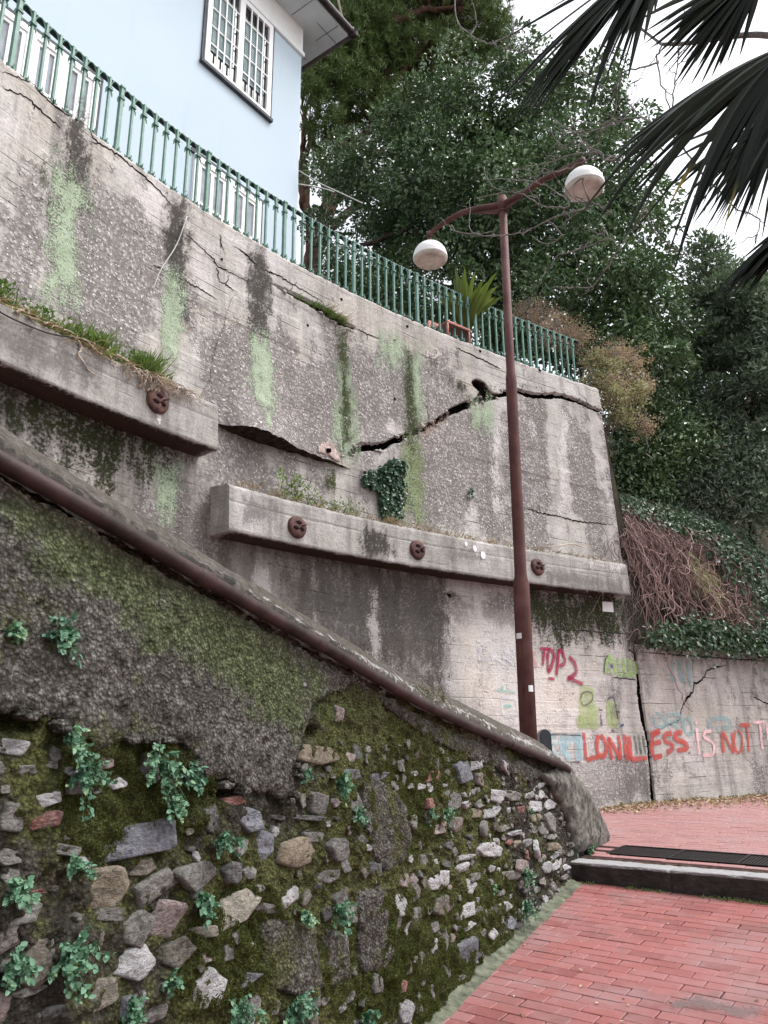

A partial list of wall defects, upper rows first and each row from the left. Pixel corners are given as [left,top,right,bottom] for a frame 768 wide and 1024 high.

water stain [35,96,101,244]
water stain [159,190,193,330]
water stain [244,244,275,343]
crack [155,234,387,342]
crack [341,347,603,458]
water stain [83,431,128,497]
water stain [552,615,572,656]
water stain [599,591,643,658]
crack [550,628,759,801]
flaking render [359,779,412,872]
flaking render [258,885,395,998]